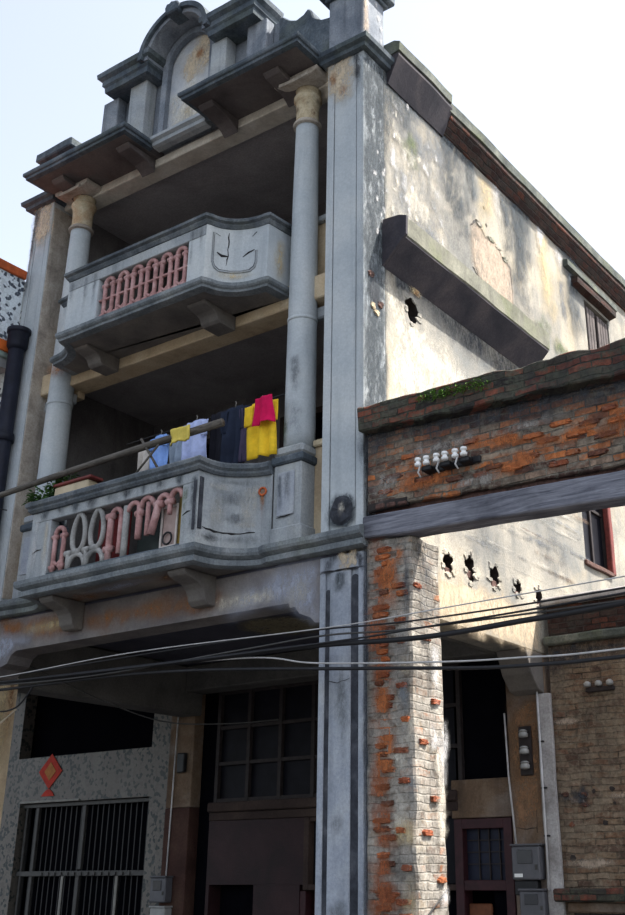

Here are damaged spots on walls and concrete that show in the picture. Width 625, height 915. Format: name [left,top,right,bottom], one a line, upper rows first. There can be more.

crack [216,233,255,264]
leakage [364,52,581,407]
flaking render [470,219,513,304]
flaking render [368,270,464,398]
flaking render [368,403,625,514]
flaking render [323,550,363,573]
flaking render [438,548,545,649]
flaking render [368,546,447,915]